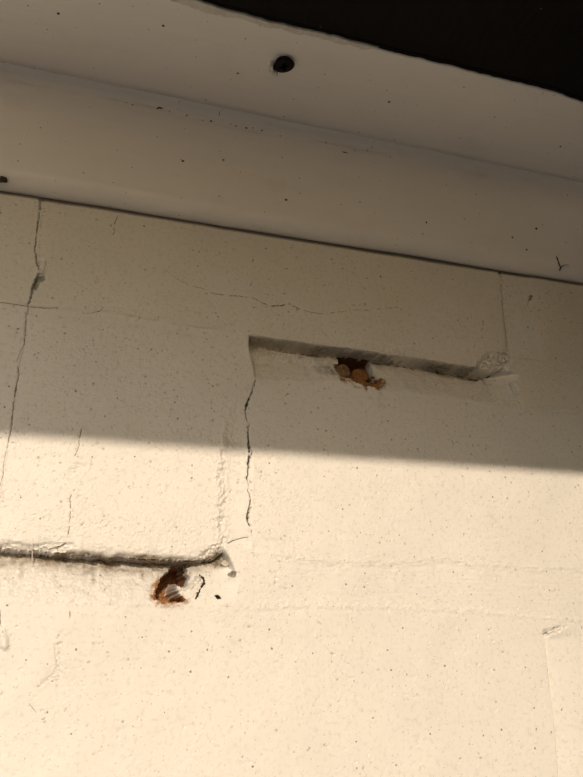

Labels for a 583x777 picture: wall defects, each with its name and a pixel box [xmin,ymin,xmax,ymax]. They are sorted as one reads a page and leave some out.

crack [0,197,58,485]
spalling [153,582,187,603]
spalling [199,543,237,578]
crack [220,381,256,569]